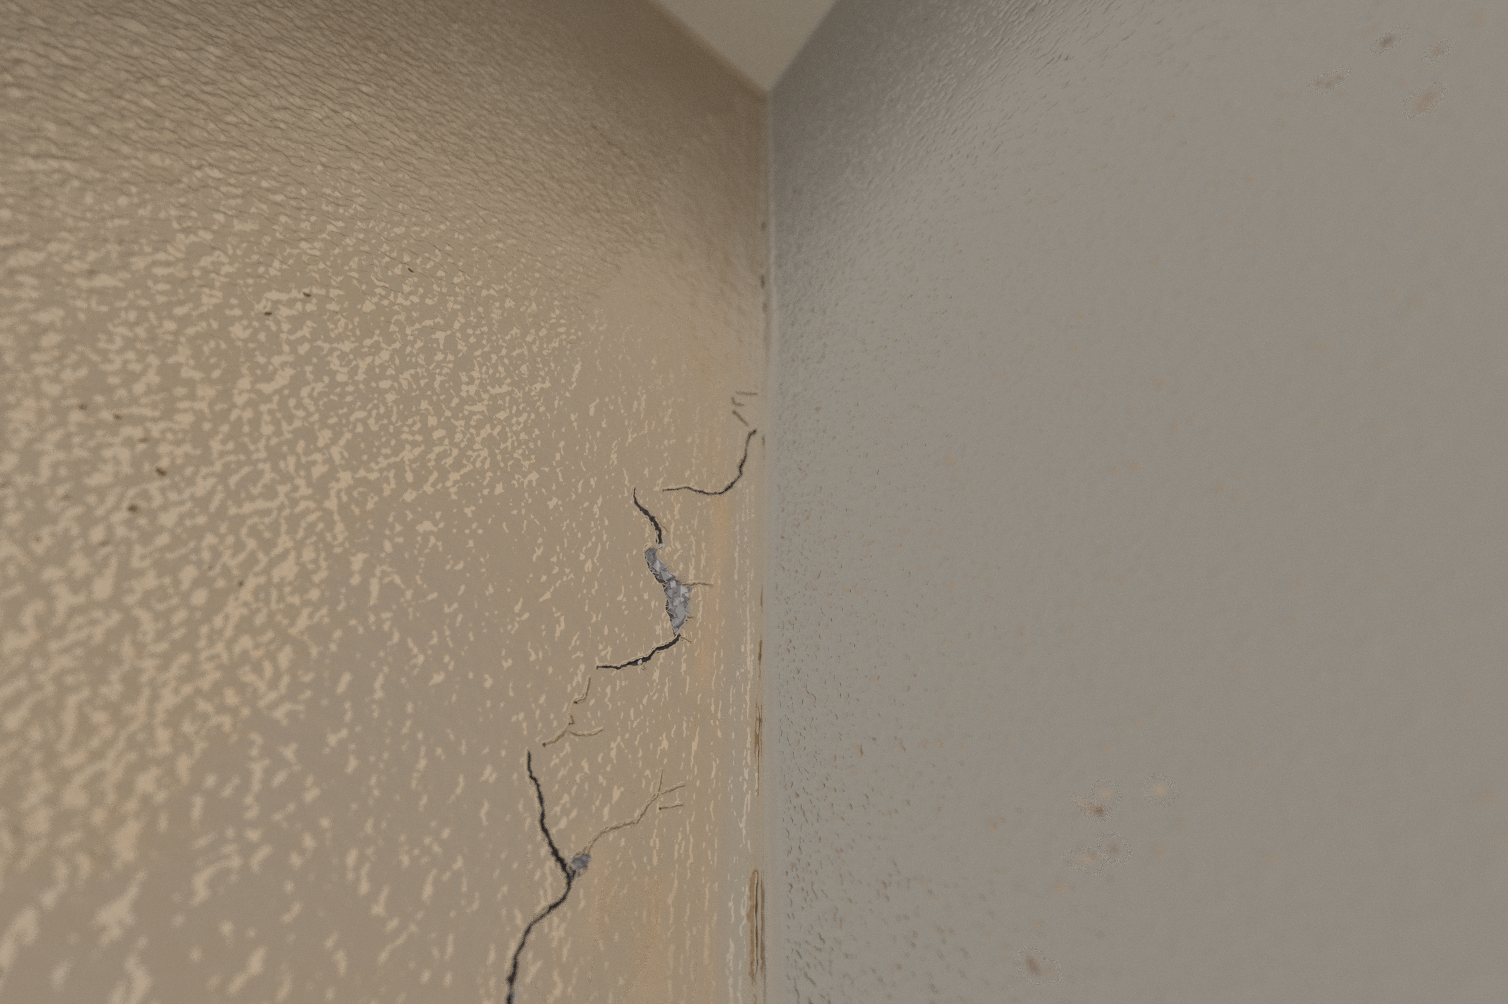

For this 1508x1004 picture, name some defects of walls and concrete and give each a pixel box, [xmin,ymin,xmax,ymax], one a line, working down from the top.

crack [503,387,758,1004]